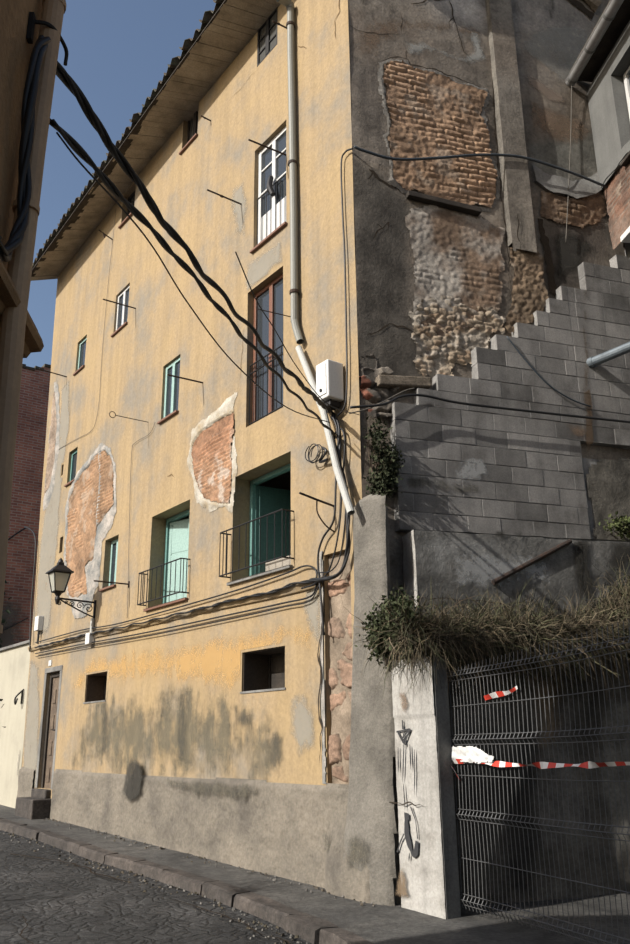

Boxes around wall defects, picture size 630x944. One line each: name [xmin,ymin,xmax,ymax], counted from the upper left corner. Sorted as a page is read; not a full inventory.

crack [333,0,557,314]
peeling [359,59,549,418]
spalling [532,163,607,229]
peeling [63,443,117,619]
peeling [187,392,237,513]
leakage [81,690,281,801]
spalling [319,551,352,784]